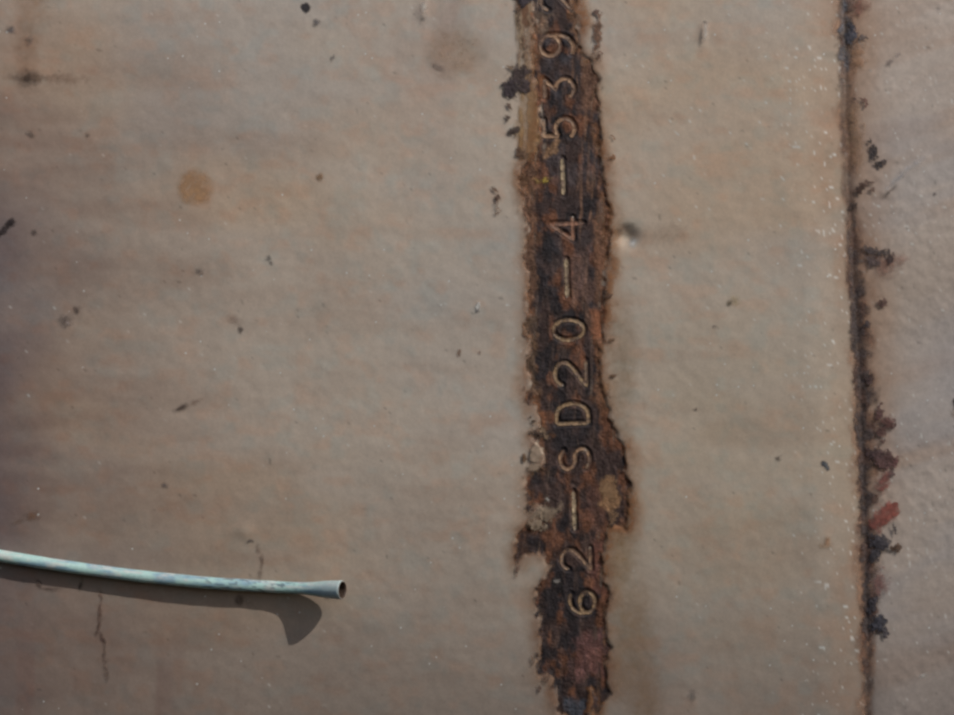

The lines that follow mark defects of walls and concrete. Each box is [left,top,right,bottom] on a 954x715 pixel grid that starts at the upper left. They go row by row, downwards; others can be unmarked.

rust [501,0,638,715]
rust [835,0,868,87]
rust [837,97,887,170]
rust [846,180,902,714]